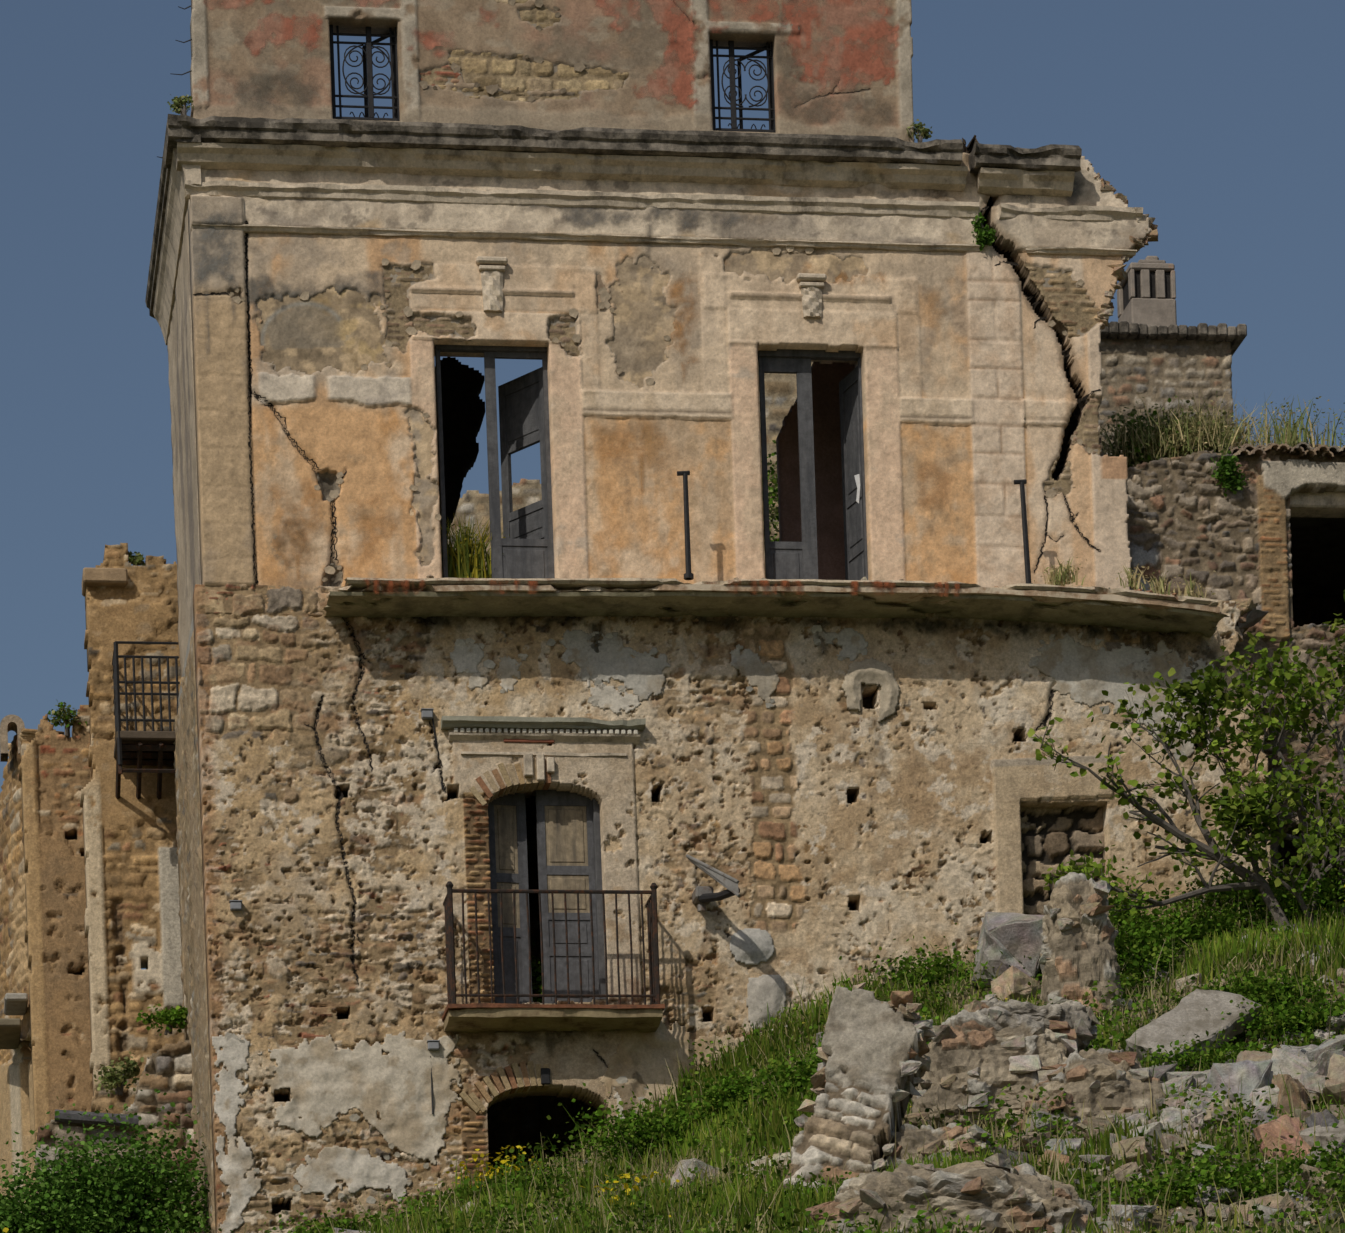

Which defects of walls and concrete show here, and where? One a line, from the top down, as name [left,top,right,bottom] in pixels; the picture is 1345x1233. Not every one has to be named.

flaking render [419,32,629,102]
crack [962,135,979,154]
spalling [1087,163,1128,204]
crack [193,220,347,584]
flaking render [229,258,476,375]
flaking render [548,308,581,356]
flaking render [596,255,677,388]
crack [978,197,1101,573]
flaking render [1024,214,1158,338]
peeling [546,630,671,715]
crack [305,617,373,985]
peeling [212,1031,462,1233]